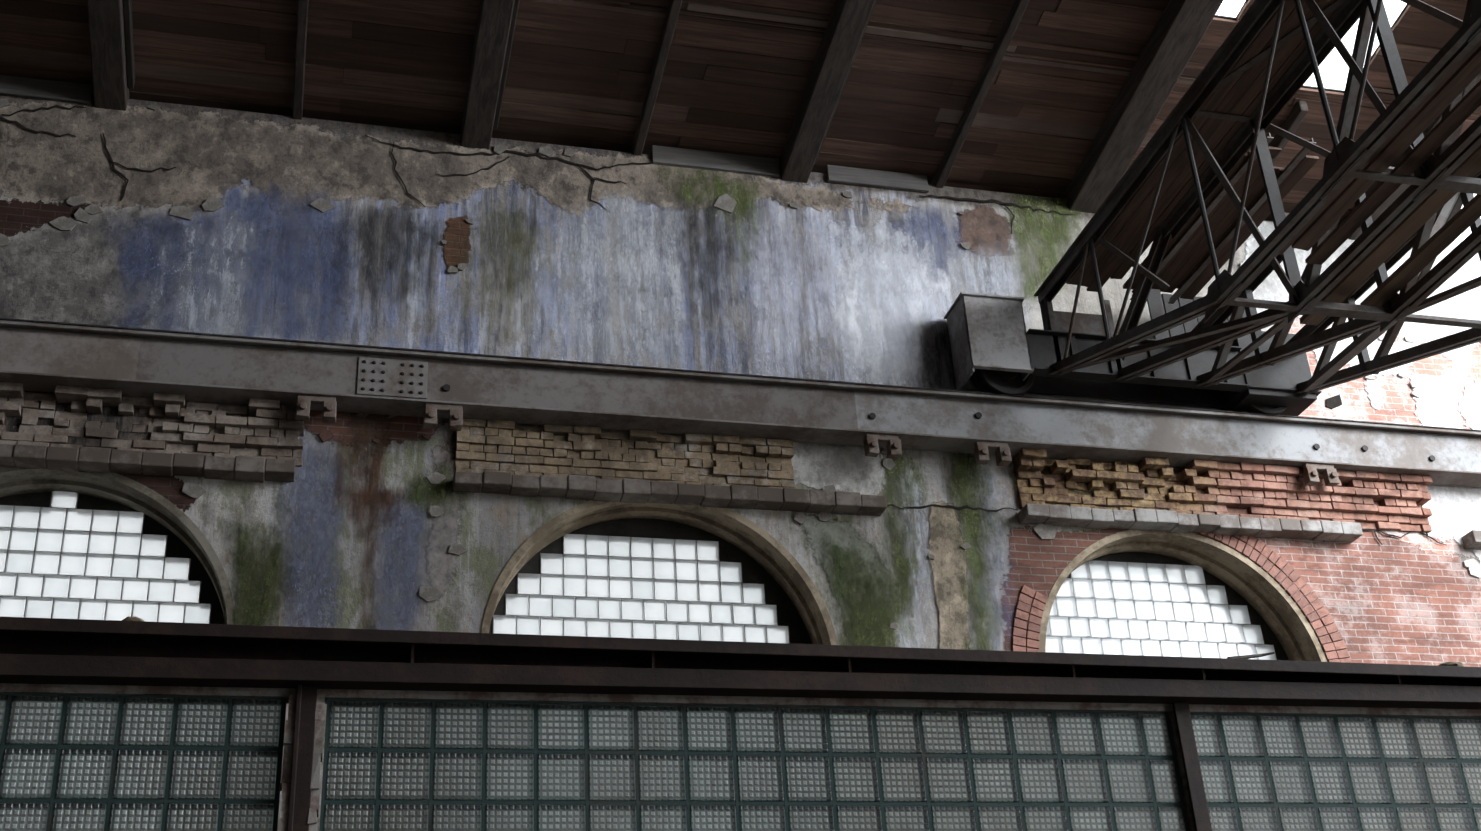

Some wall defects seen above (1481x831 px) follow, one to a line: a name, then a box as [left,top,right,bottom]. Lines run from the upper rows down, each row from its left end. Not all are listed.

crack [0,105,176,201]
leakage [114,191,438,340]
peeling [0,98,920,329]
crack [365,135,653,210]
leakage [484,185,1068,387]
peeling [1240,212,1289,266]
peeling [1252,238,1355,334]
spalling [1299,249,1481,430]
peeling [1431,241,1461,269]
leakage [849,466,927,647]
spalling [1000,523,1129,651]
spalling [1227,484,1481,667]